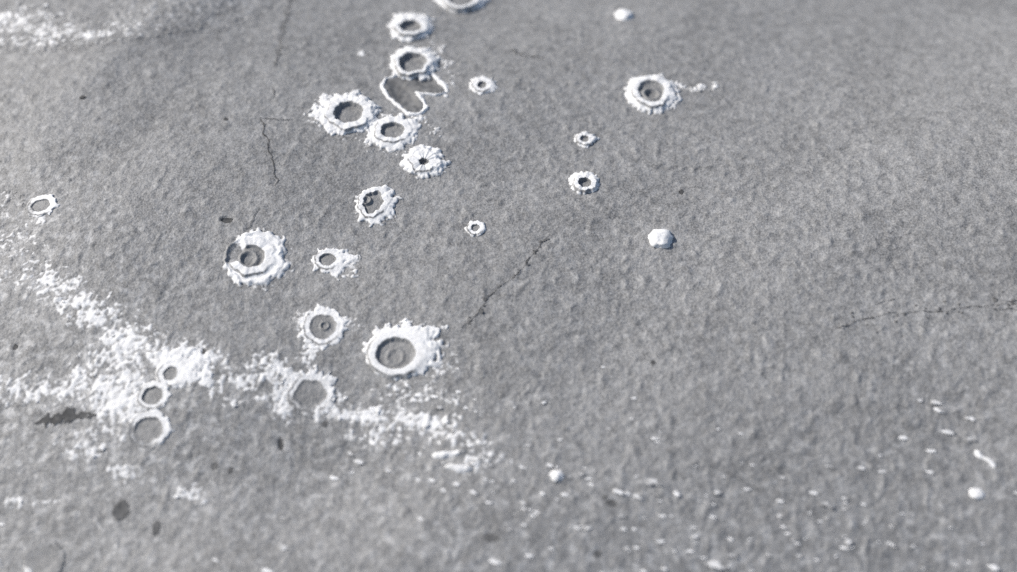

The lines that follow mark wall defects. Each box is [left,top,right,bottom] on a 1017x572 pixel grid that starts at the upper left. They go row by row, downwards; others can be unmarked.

crack [273,0,293,93]
crack [260,118,292,186]
crack [464,235,549,325]
leakage [0,188,320,484]
leakage [313,351,513,478]
leakage [3,496,57,509]
leakage [171,482,214,504]